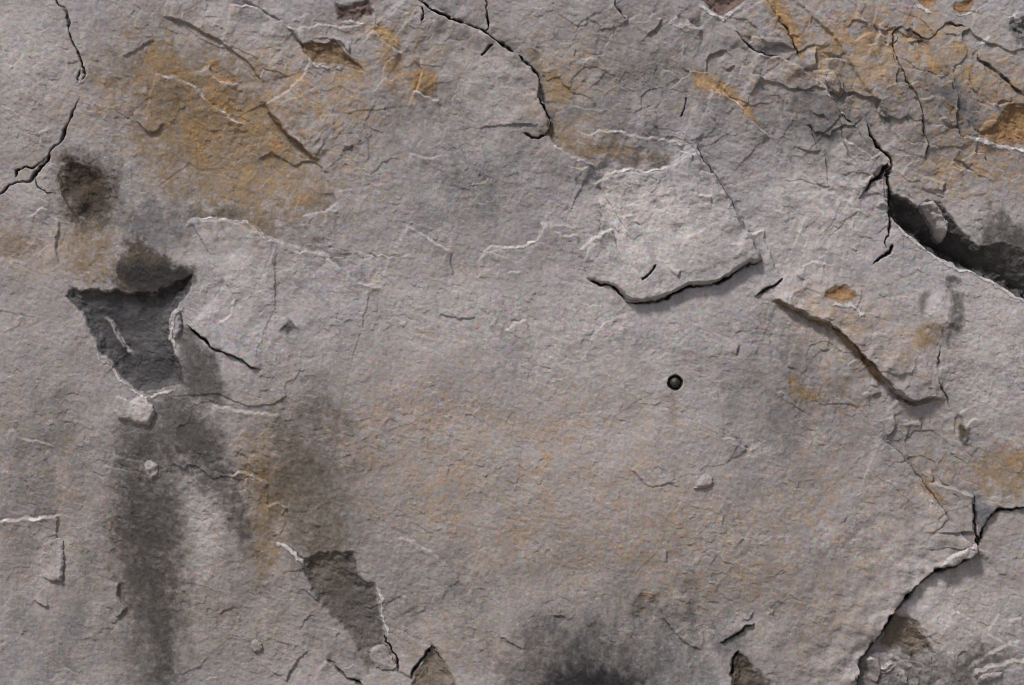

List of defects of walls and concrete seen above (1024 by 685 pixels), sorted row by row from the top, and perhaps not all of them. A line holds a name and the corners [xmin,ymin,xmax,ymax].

rust [763,0,804,58]
crack [0,0,86,195]
rust [130,24,328,231]
rust [694,71,759,127]
damp [61,154,119,231]
crack [591,264,732,304]
crack [848,121,893,264]
spalling [887,193,1024,302]
spalling [67,282,191,425]
damp [115,328,250,685]
spalling [276,542,396,670]
damp [542,665,637,685]